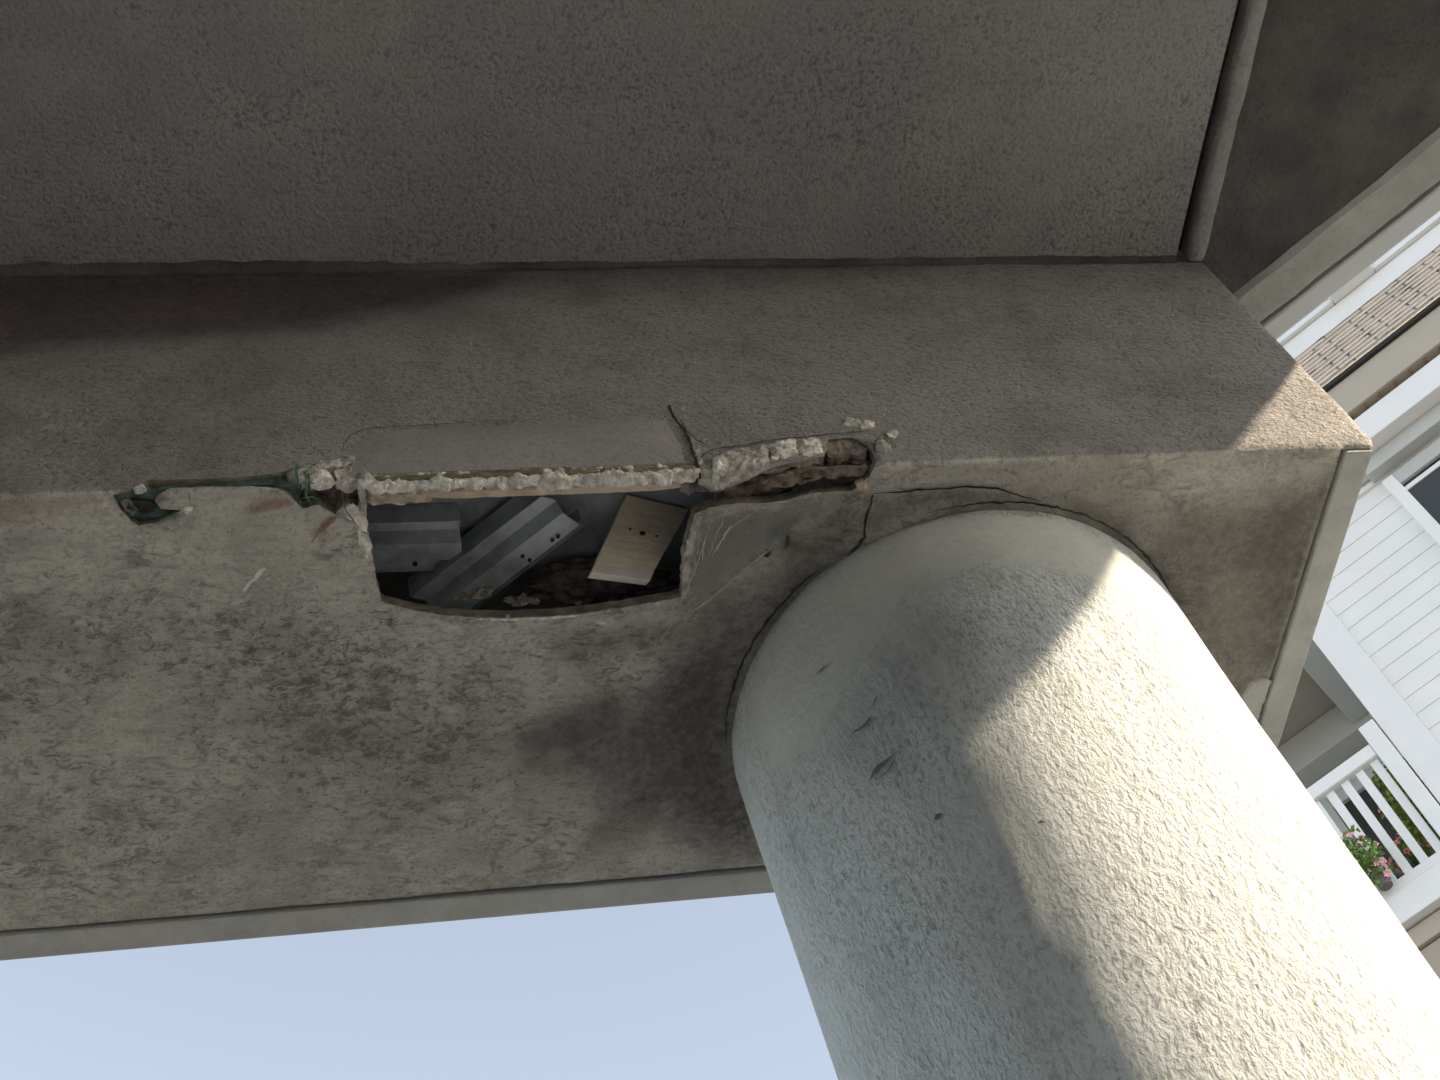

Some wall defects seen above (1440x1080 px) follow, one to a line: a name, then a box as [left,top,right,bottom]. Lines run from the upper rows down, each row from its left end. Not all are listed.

crack [667,403,890,479]
spalling [114,417,898,558]
spalling [679,514,703,596]
spalling [453,585,608,625]
crack [725,486,1171,744]